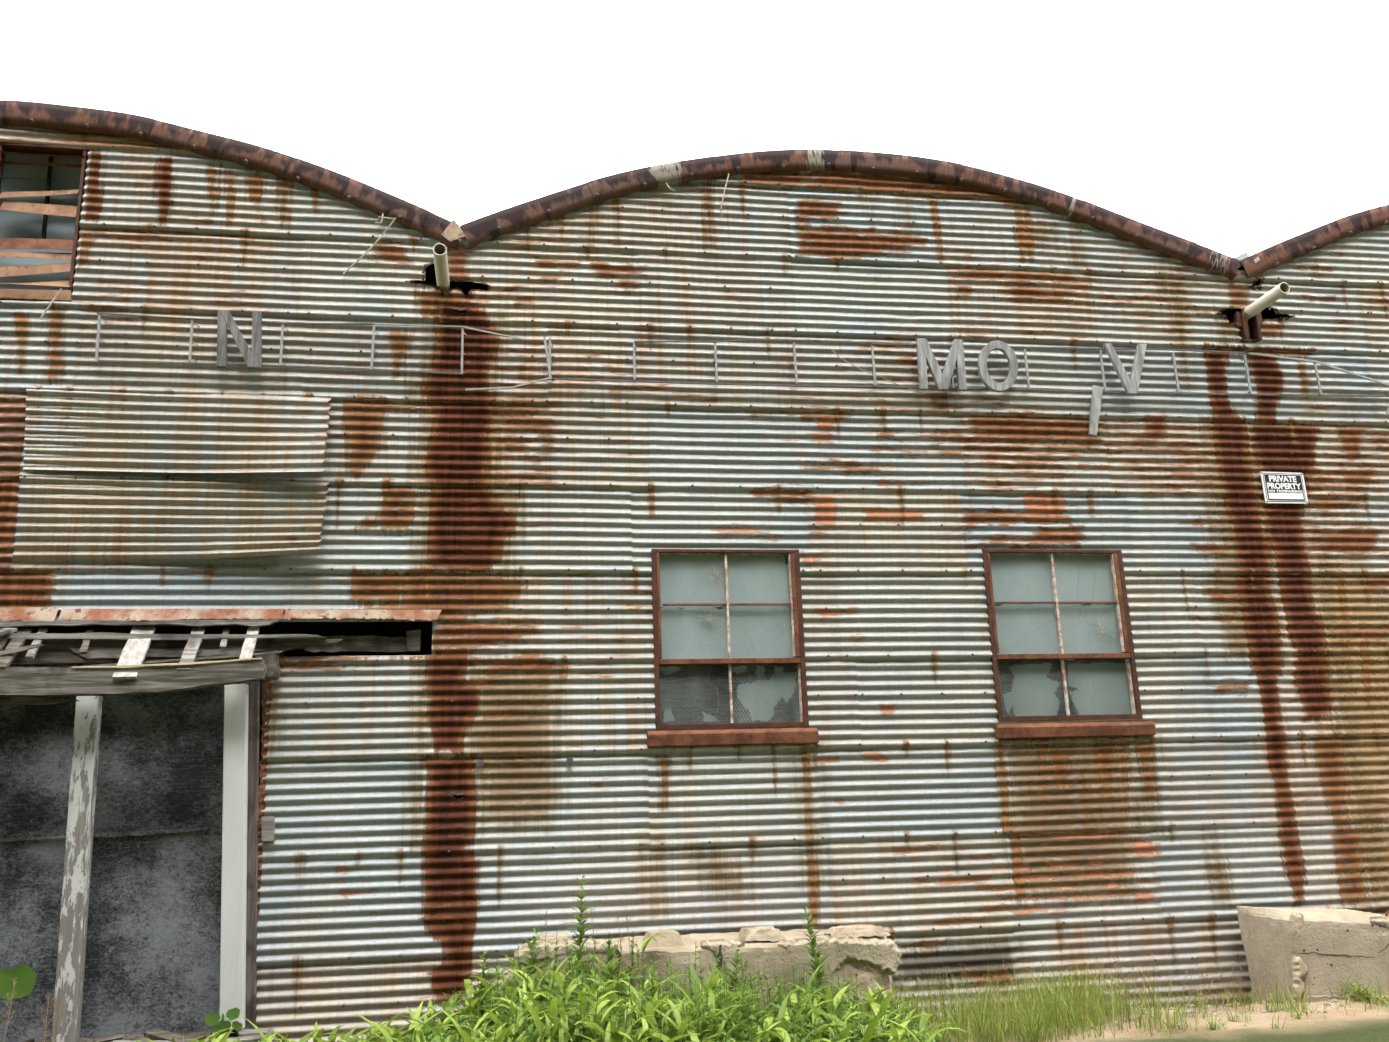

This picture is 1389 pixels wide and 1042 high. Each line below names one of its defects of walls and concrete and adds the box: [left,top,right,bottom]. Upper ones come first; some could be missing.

corrosion [78,151,104,267]
corrosion [147,157,174,233]
corrosion [206,164,293,266]
corrosion [373,235,417,267]
corrosion [513,197,647,307]
corrosion [739,170,1091,306]
corrosion [1293,249,1348,305]
corrosion [0,465,57,620]
corrosion [257,246,558,1001]
corrosion [959,488,1094,550]
corrosion [1162,280,1389,909]
corrosion [994,738,1174,901]